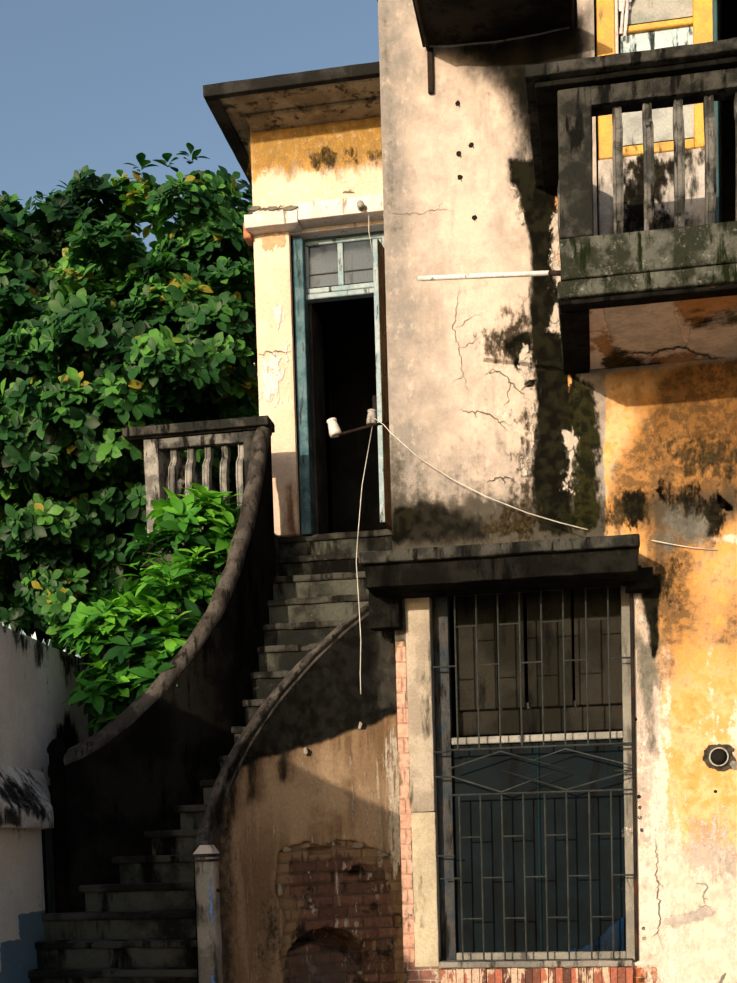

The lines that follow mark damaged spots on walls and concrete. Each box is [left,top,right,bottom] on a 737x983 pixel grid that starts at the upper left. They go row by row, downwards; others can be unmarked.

leakage [254,119,382,175]
leakage [623,147,705,233]
peeling [257,340,289,407]
leakage [391,140,573,545]
crack [452,293,530,431]
leakage [601,350,661,369]
leakage [0,765,50,828]
leakage [208,607,397,837]
flaking render [275,641,442,983]
peeling [633,593,650,756]
spalling [702,744,737,772]
peeling [633,806,737,983]